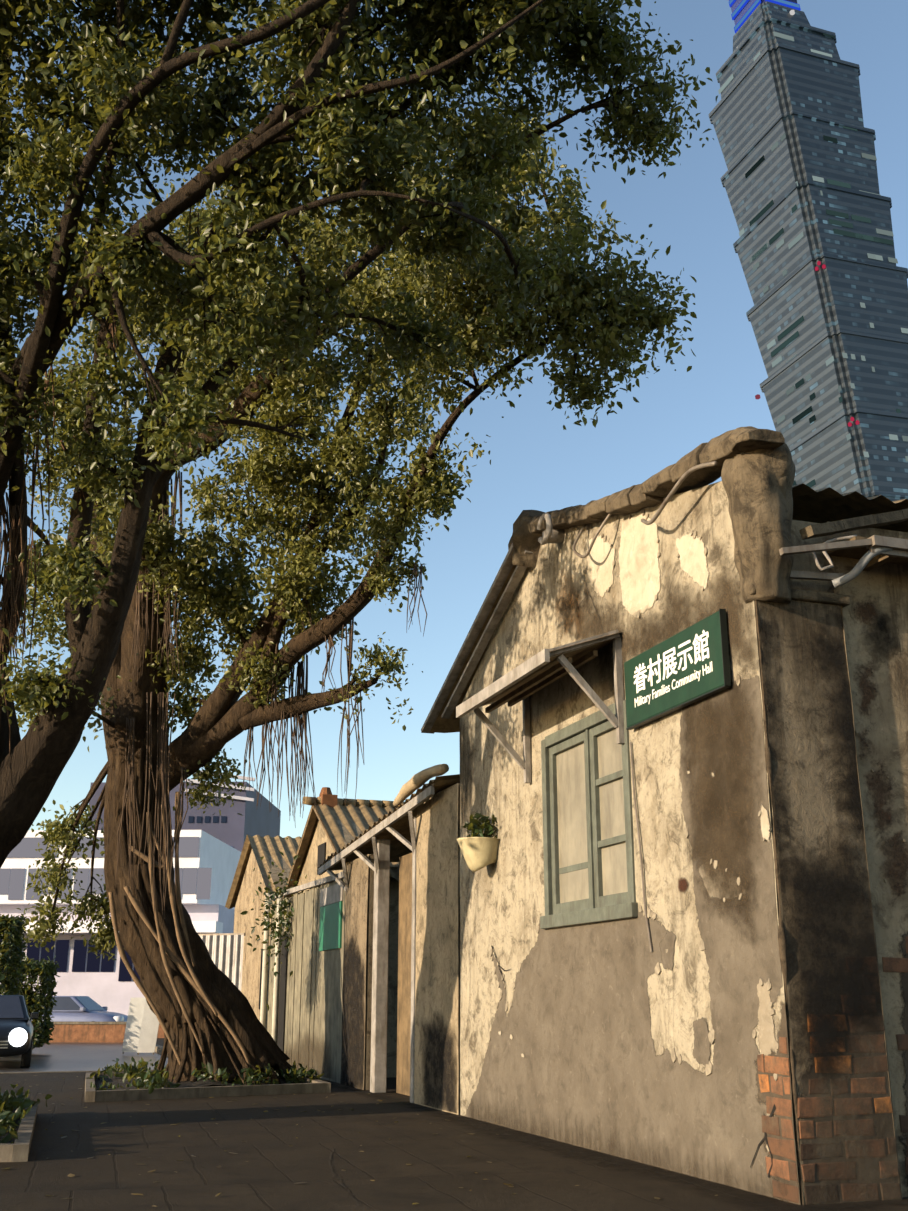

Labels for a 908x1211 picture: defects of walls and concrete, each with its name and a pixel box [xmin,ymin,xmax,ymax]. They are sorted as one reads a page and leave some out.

peeling [586,509,661,618]
peeling [676,530,709,591]
damp [579,576,881,1073]
peeling [465,664,908,1205]
damp [422,1018,457,1113]